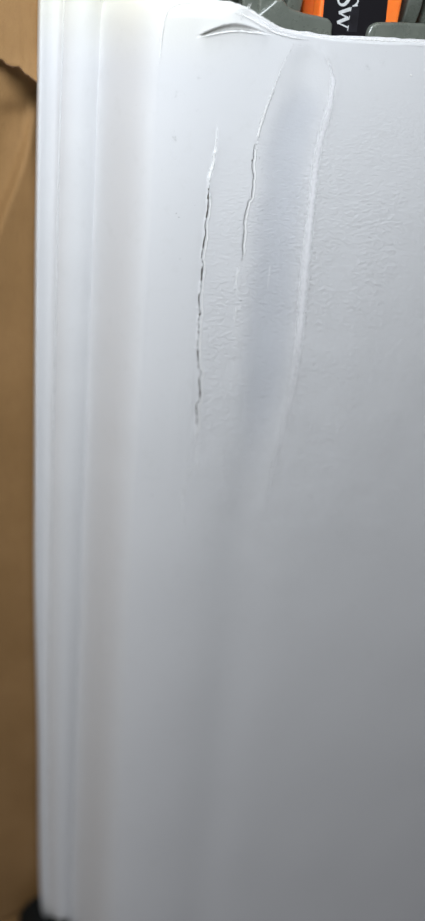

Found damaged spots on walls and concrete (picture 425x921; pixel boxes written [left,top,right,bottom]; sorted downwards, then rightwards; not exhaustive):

crack [180,154,215,524]
crack [232,92,273,325]